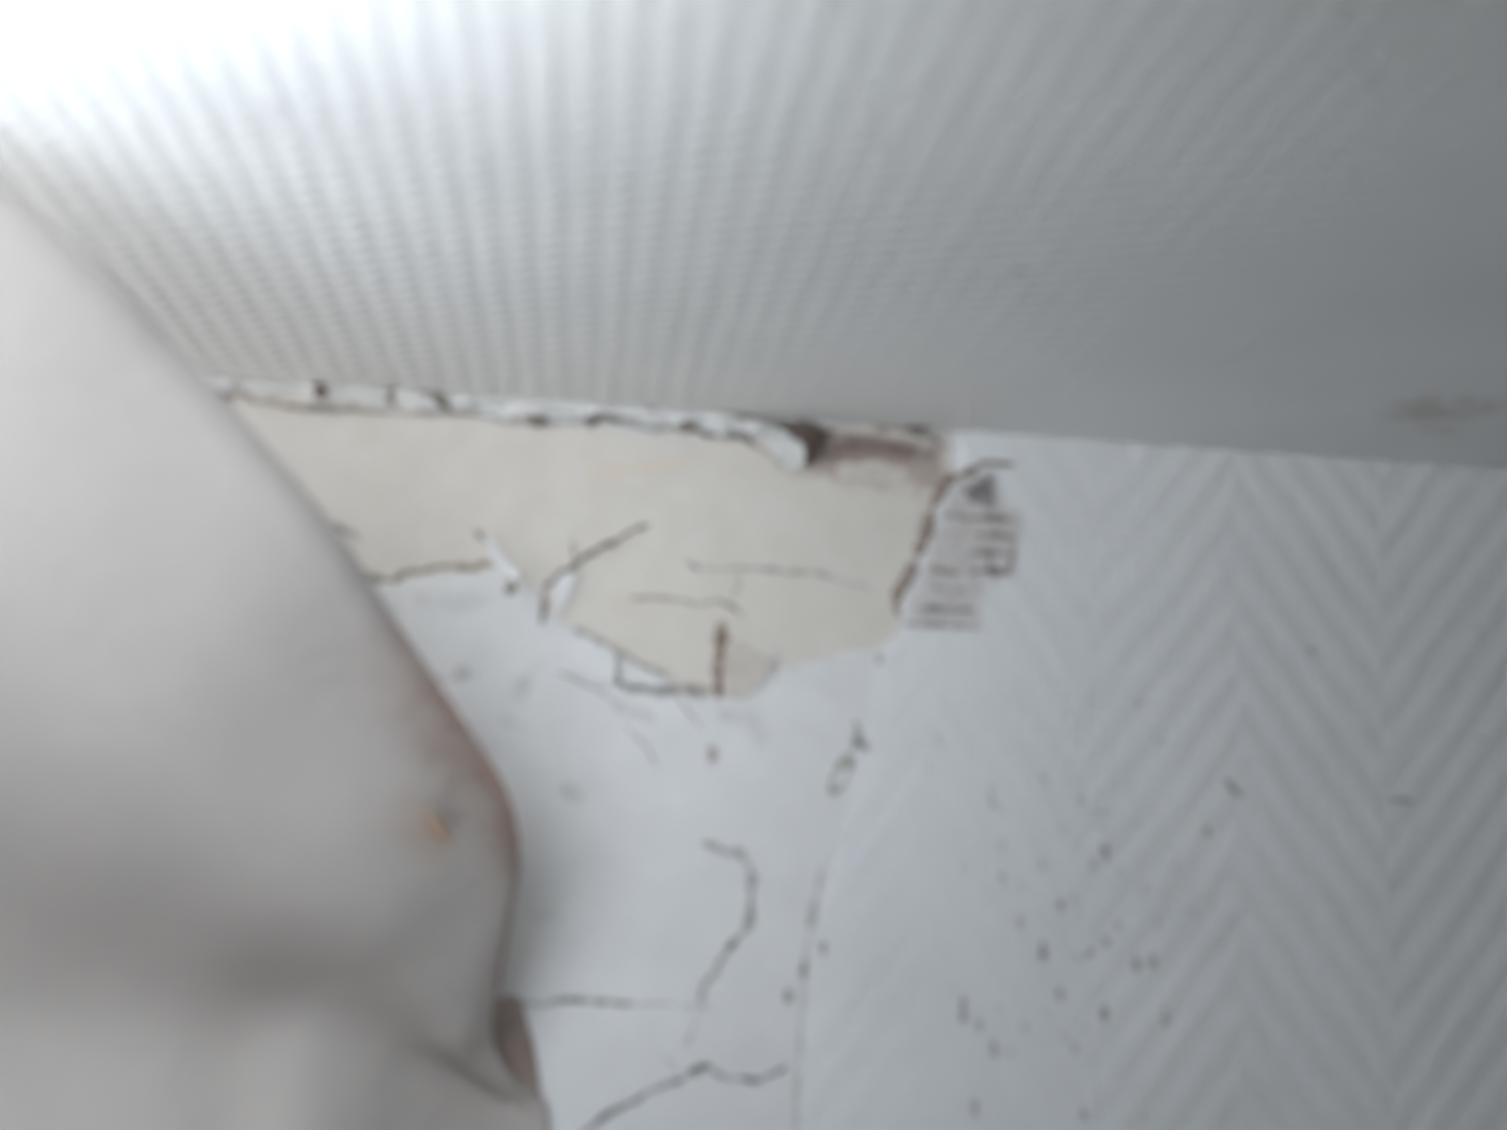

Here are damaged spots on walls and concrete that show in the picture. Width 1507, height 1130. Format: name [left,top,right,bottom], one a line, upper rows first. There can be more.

crack [293,389,478,416]
crack [525,407,805,448]
crack [366,524,648,621]
peeling [0,184,935,1130]
crack [634,625,773,699]
crack [514,997,630,1006]
crack [587,1063,784,1130]